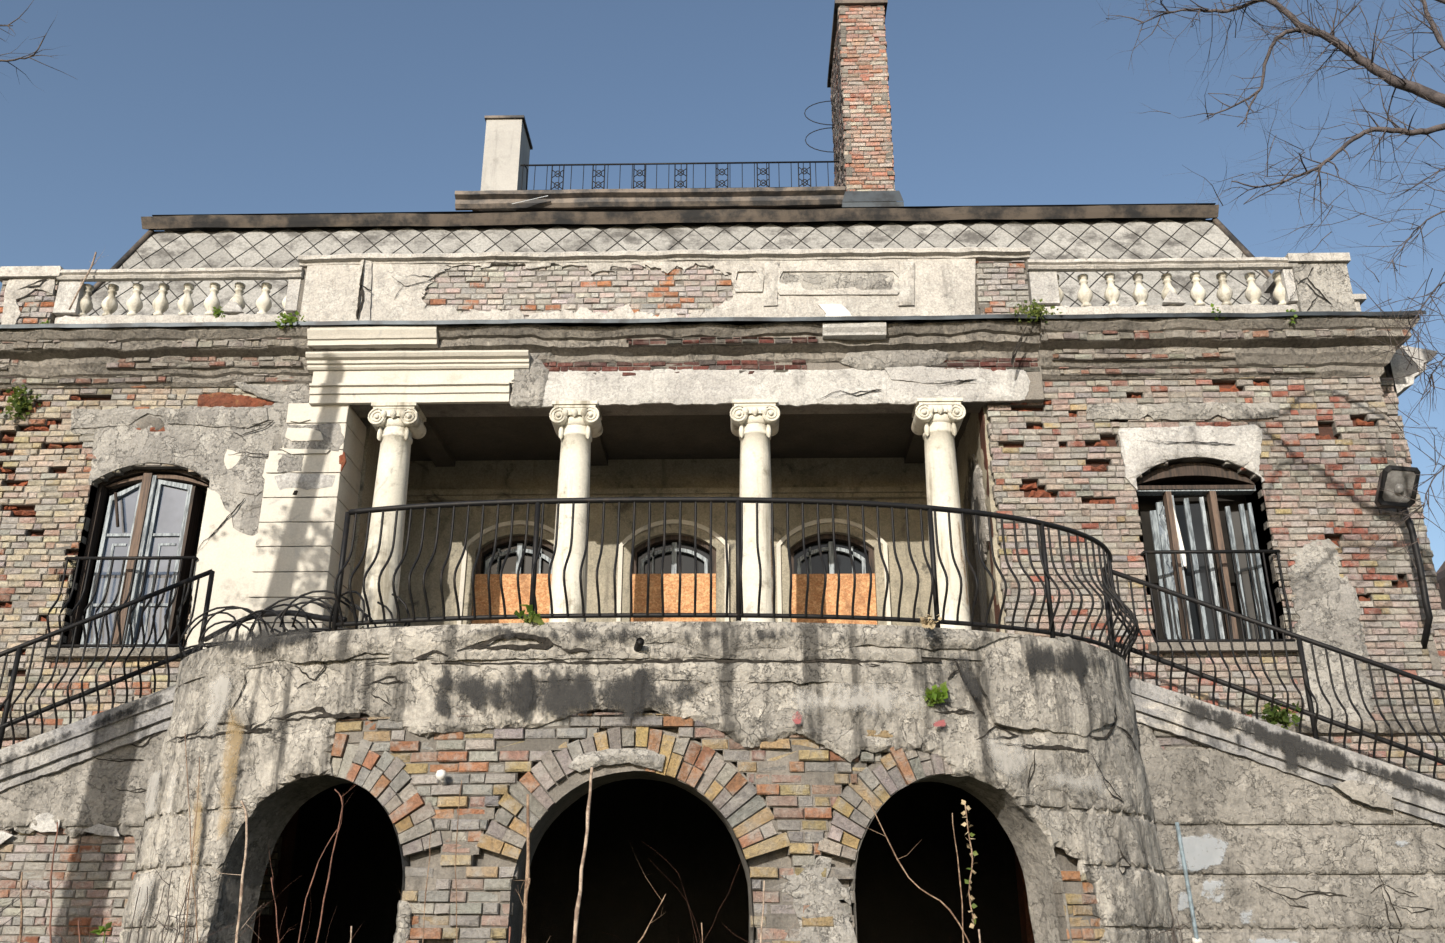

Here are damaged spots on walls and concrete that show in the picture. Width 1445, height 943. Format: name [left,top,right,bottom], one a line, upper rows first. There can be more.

crack [356,259,435,319]
flaking render [422,265,737,319]
flaking render [818,304,852,317]
flaking render [197,375,282,407]
spalling [0,403,82,486]
flaking render [217,415,347,511]
damp [477,626,558,640]
damp [575,629,652,641]
damp [434,668,720,722]
damp [793,688,892,724]
damp [949,651,982,699]
flaking render [0,812,136,943]